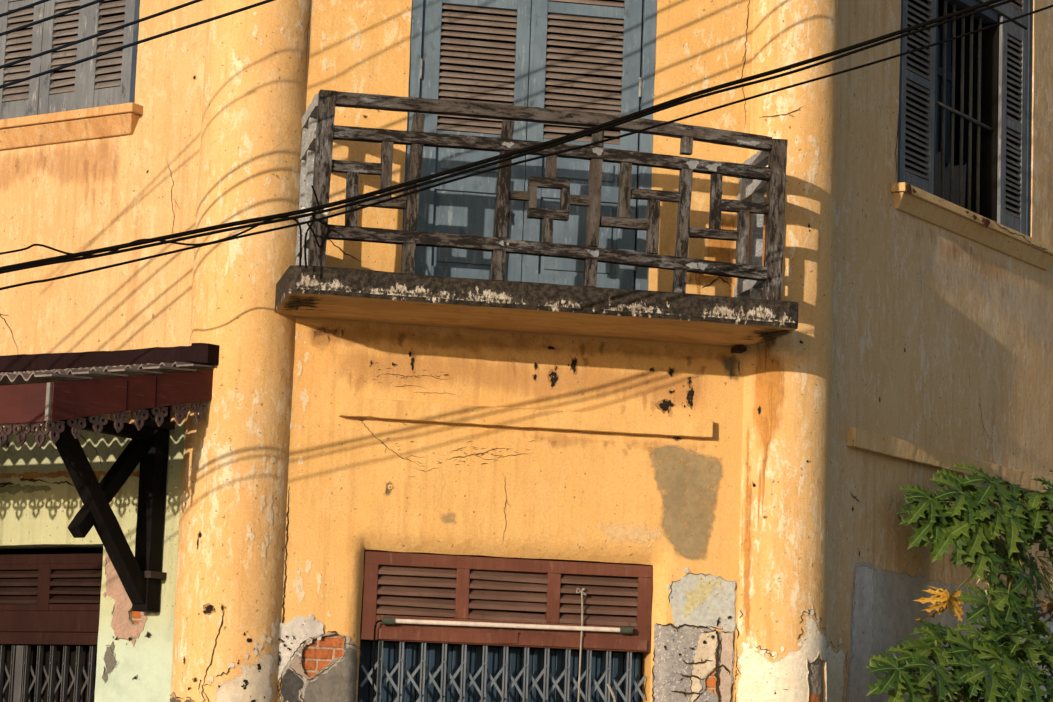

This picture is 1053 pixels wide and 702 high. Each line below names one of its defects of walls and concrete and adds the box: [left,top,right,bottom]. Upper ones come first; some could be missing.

crack [741,0,800,131]
peeling [296,274,526,305]
peeling [606,296,670,313]
damp [724,358,740,379]
peeling [704,304,794,323]
crack [359,419,531,544]
peeling [188,557,357,702]
peeling [664,567,848,702]